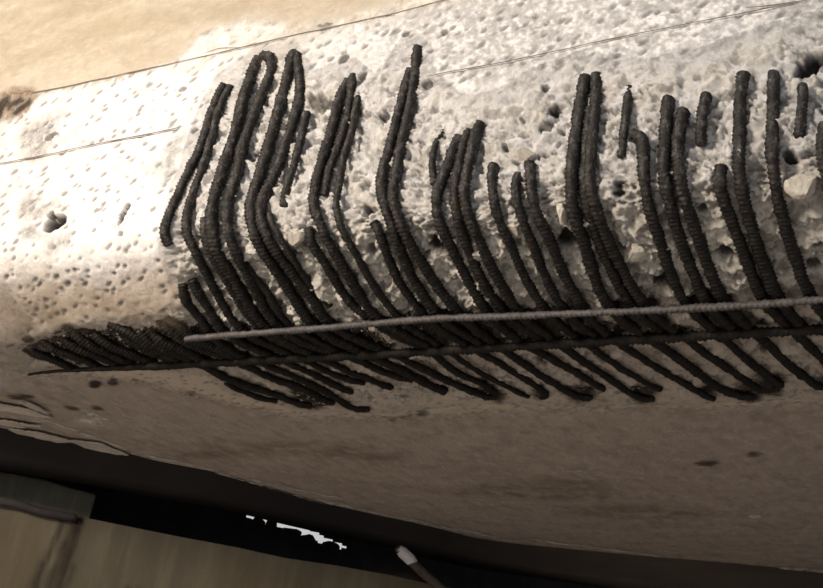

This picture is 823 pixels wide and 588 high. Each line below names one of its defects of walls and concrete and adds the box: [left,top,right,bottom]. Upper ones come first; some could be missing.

spalling [0,0,823,421]